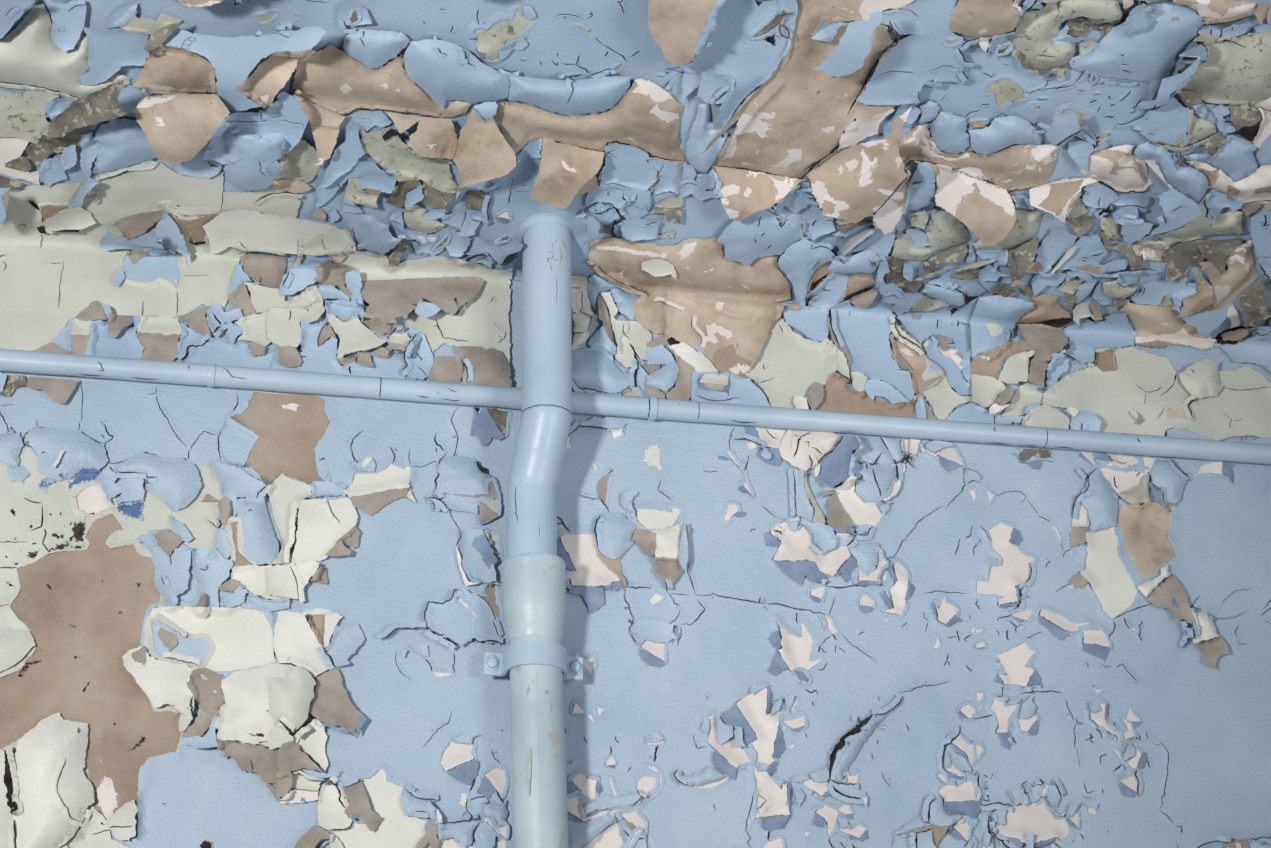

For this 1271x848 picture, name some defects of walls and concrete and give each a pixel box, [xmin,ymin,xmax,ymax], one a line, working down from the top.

peeling [0,0,181,86]
peeling [0,90,523,384]
peeling [571,0,1271,441]
crack [4,745,23,848]
crack [0,494,49,606]
peeling [0,389,514,848]
crack [745,790,770,848]
peeling [681,426,915,848]
crack [619,421,1101,804]
peeling [900,450,1184,848]
crack [909,603,1271,848]
crack [1179,585,1271,648]